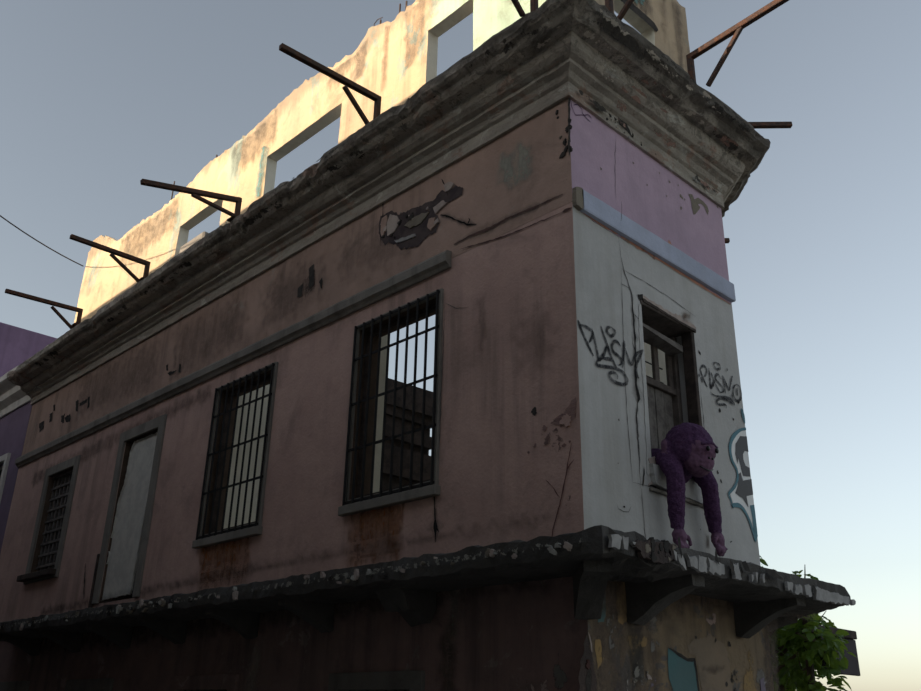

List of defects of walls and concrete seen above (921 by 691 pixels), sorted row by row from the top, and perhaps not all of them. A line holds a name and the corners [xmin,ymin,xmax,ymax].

spalling [555,97,591,159]
spalling [379,182,463,250]
peeling [669,181,718,214]
crack [618,258,693,537]
spalling [251,397,581,592]
spalling [0,586,239,631]
spalling [578,632,604,691]
flaking render [668,633,736,691]